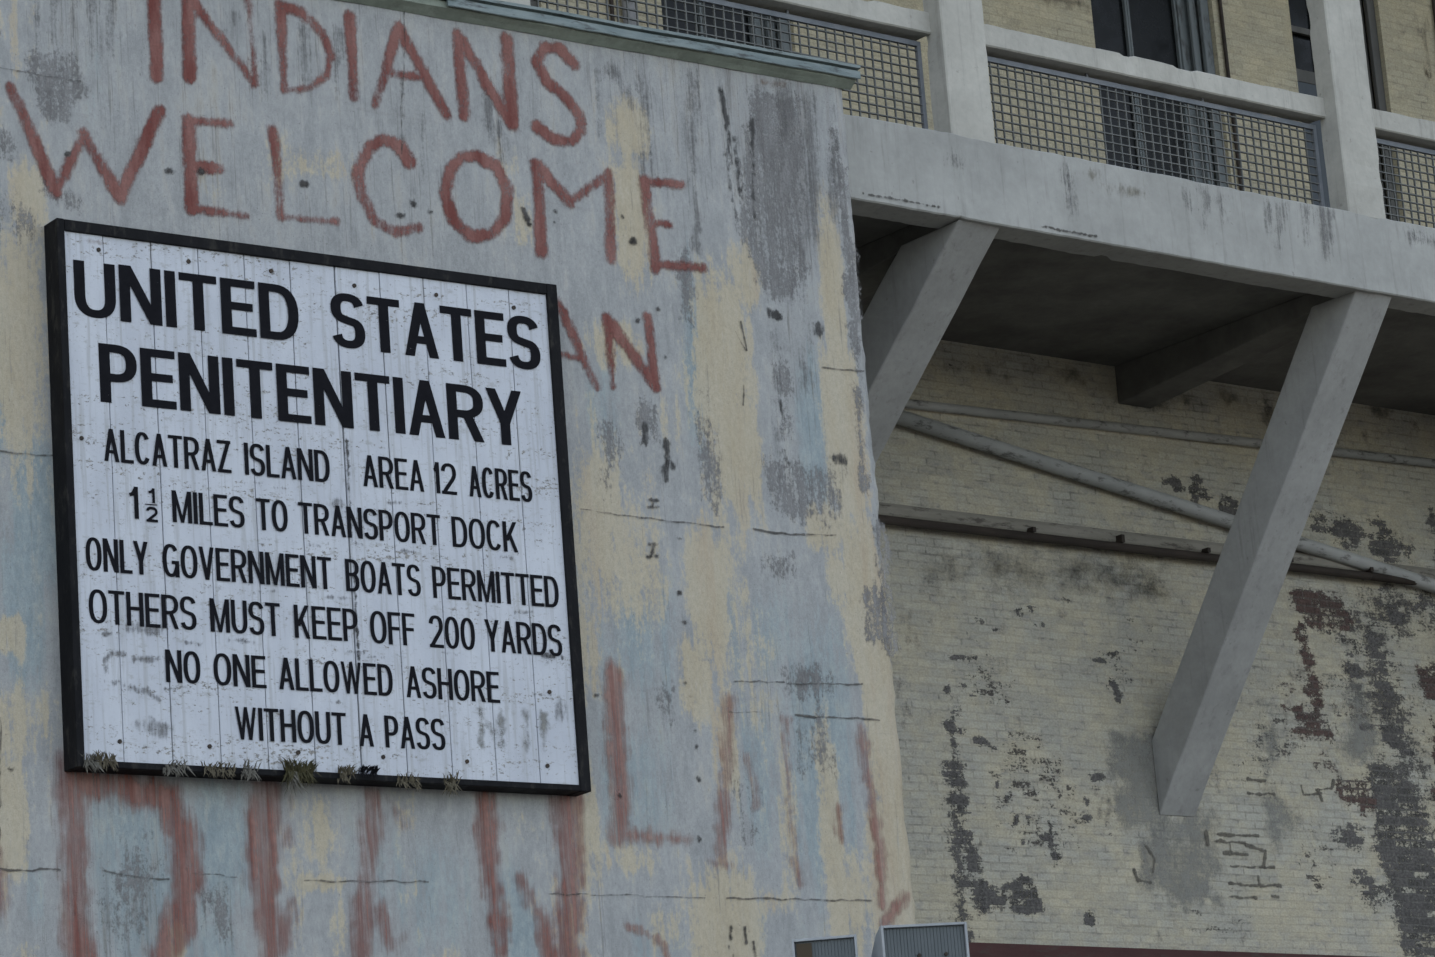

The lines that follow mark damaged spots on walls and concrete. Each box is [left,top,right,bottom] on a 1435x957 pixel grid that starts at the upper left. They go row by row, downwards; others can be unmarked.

peeling [735,89,811,302]
peeling [828,128,870,494]
peeling [863,519,901,656]
peeling [1162,474,1238,515]
peeling [1309,505,1415,563]
peeling [941,655,1106,942]
peeling [1238,580,1435,957]